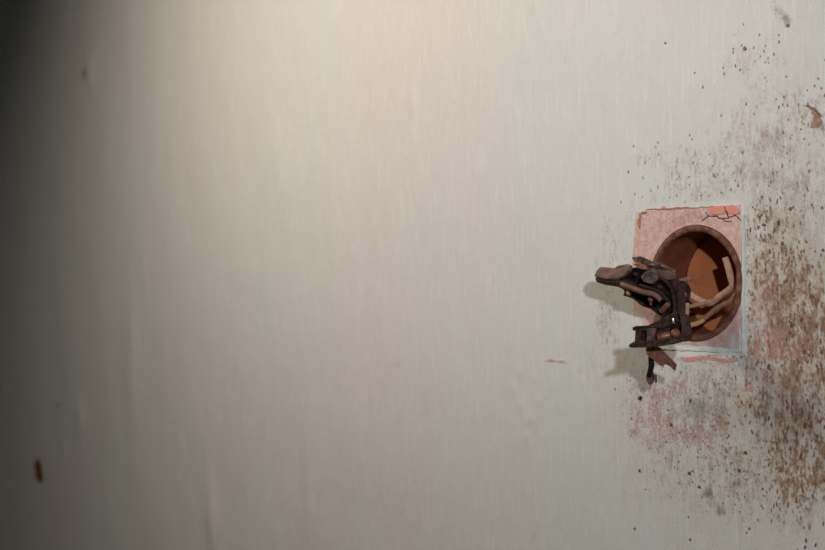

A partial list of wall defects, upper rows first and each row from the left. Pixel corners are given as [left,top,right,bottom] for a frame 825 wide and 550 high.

flaking render [631,204,811,359]